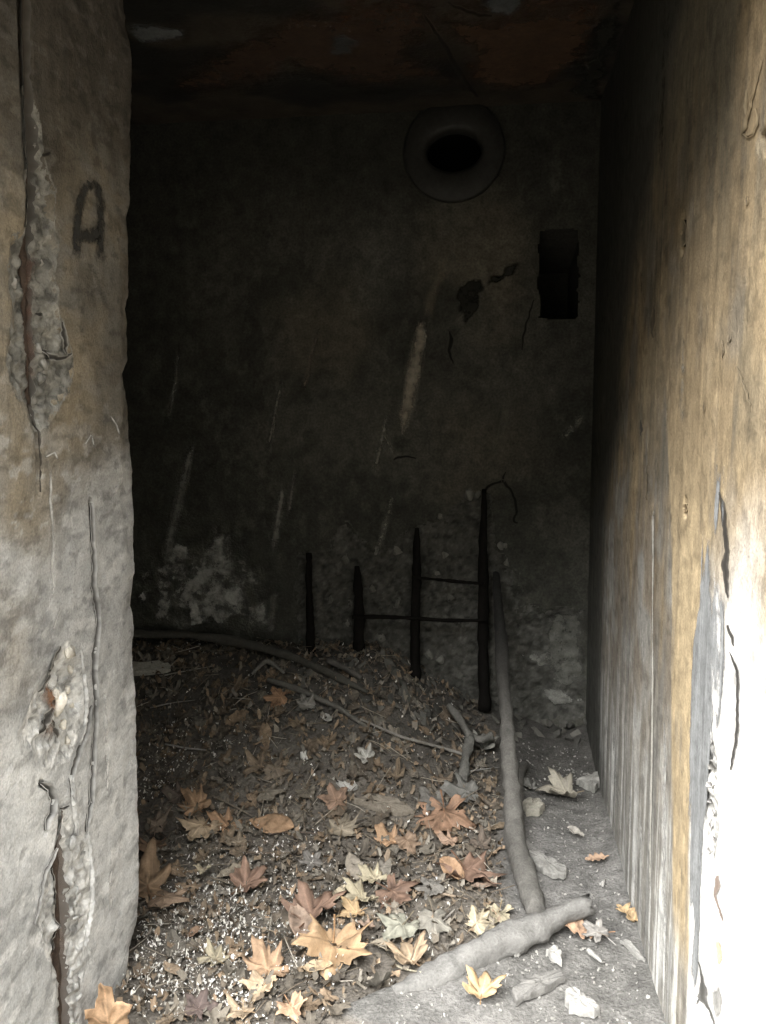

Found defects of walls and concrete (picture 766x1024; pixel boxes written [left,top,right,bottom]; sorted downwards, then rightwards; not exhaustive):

spalling [5,85,74,433]
peeling [457,263,518,322]
damp [156,448,277,631]
spalling [17,636,85,770]
crack [38,503,102,1024]
peeling [689,545,725,988]
spalling [34,812,91,1024]